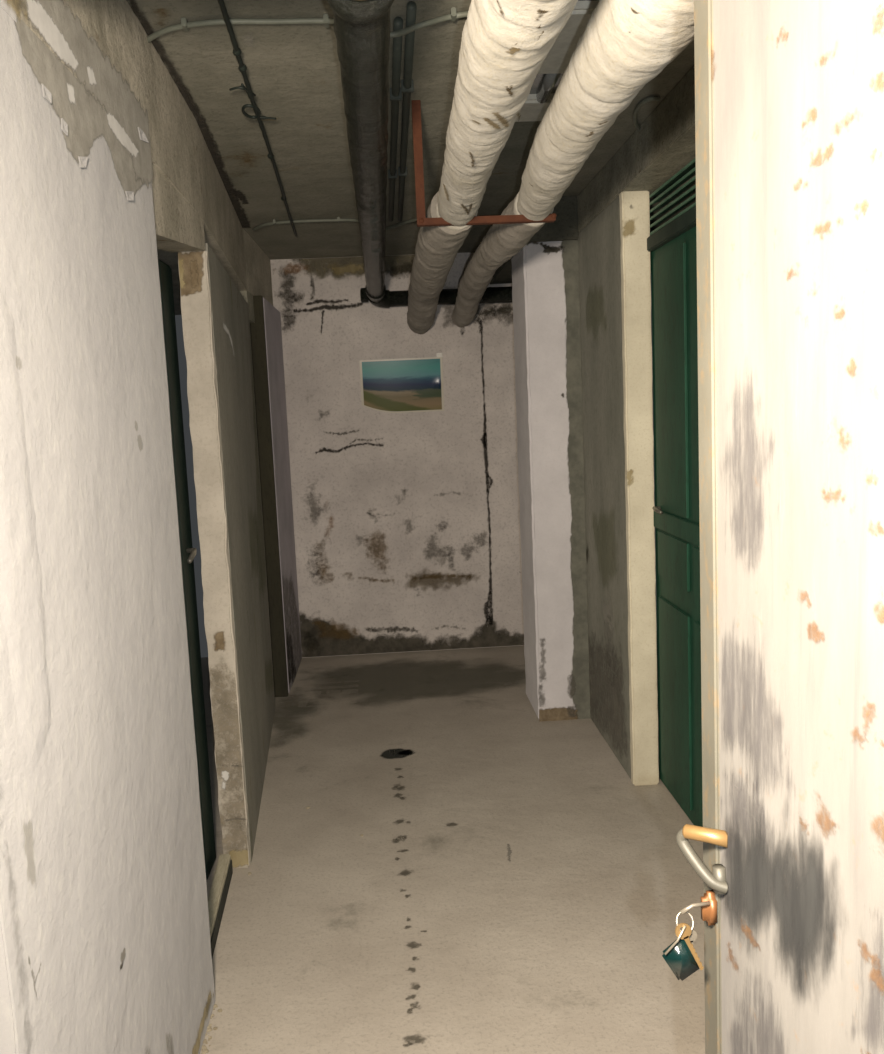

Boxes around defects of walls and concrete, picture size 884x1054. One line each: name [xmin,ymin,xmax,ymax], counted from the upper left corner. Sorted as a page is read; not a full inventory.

peeling [7,0,153,201]
crack [294,299,363,333]
crack [315,430,383,454]
crack [480,321,493,625]
leakage [324,663,522,702]